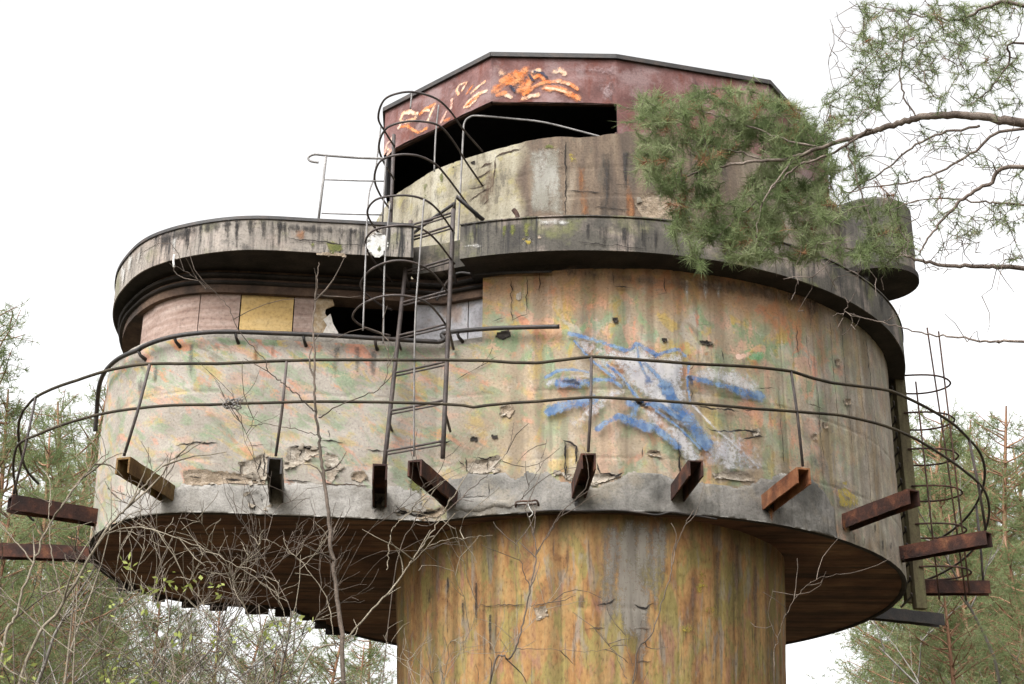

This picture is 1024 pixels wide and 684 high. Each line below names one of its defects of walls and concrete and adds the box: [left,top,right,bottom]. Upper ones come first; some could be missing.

crack [470,149,520,205]
damp [531,152,563,224]
spalling [635,192,675,220]
damp [161,220,364,249]
spalling [183,451,272,511]
spalling [283,443,369,483]
spalling [458,455,501,474]
spalling [590,472,621,486]